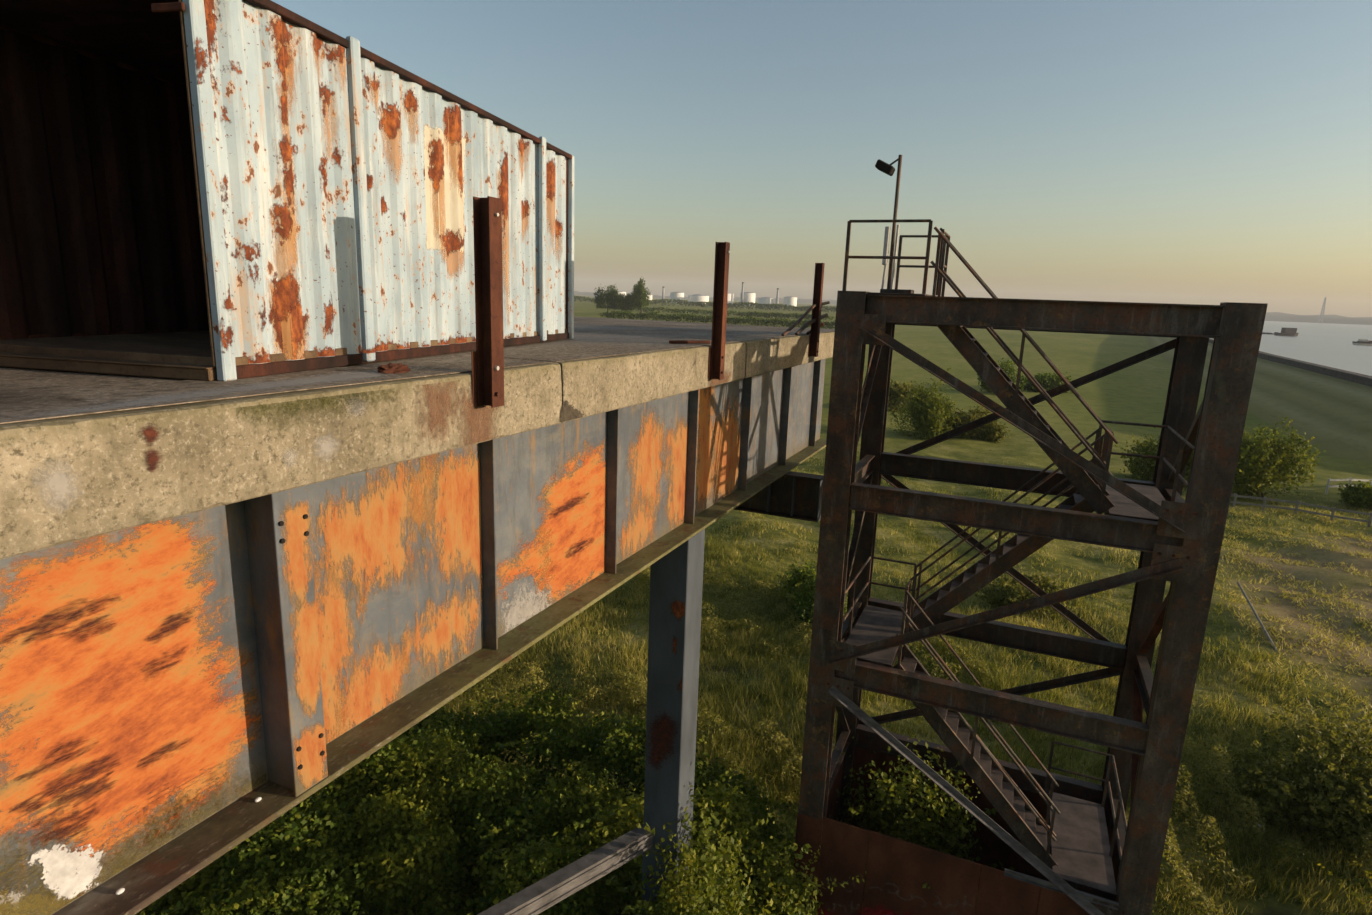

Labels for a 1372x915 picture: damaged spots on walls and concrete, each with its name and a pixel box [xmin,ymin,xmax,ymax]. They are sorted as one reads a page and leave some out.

corrosion [195,0,242,94]
corrosion [220,15,336,364]
corrosion [311,32,346,196]
corrosion [366,174,407,225]
corrosion [364,74,419,173]
corrosion [424,105,464,275]
corrosion [359,331,476,353]
corrosion [282,372,741,790]
corrosion [0,520,262,858]
damp [0,774,267,915]